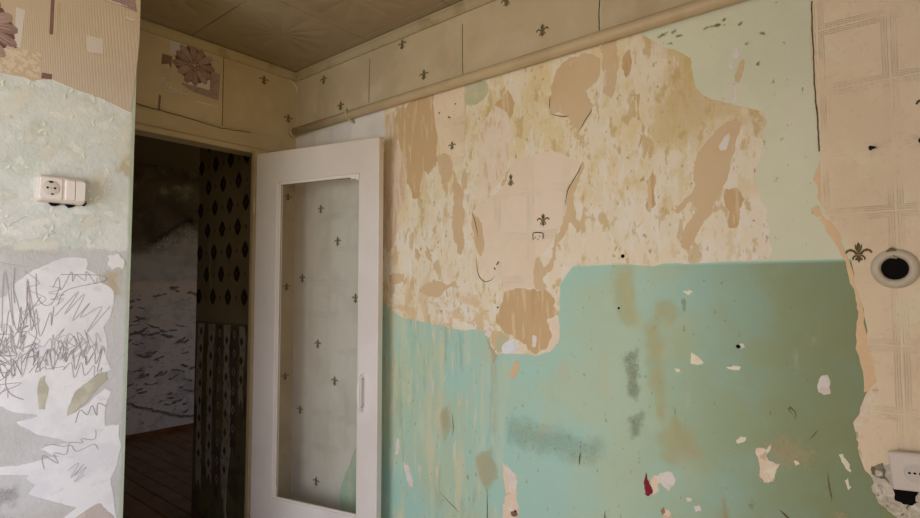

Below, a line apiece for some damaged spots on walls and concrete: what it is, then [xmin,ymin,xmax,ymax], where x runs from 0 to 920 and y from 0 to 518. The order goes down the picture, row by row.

peeling [383,111,407,255]
peeling [502,318,560,379]
peeling [691,353,703,365]
peeling [37,375,49,410]
peeling [67,372,108,416]
peeling [817,375,831,395]
peeling [395,439,413,487]
peeling [502,463,519,518]
peeling [644,471,676,496]
peeling [755,445,779,483]
peeling [839,454,852,490]
flaking render [853,384,920,518]